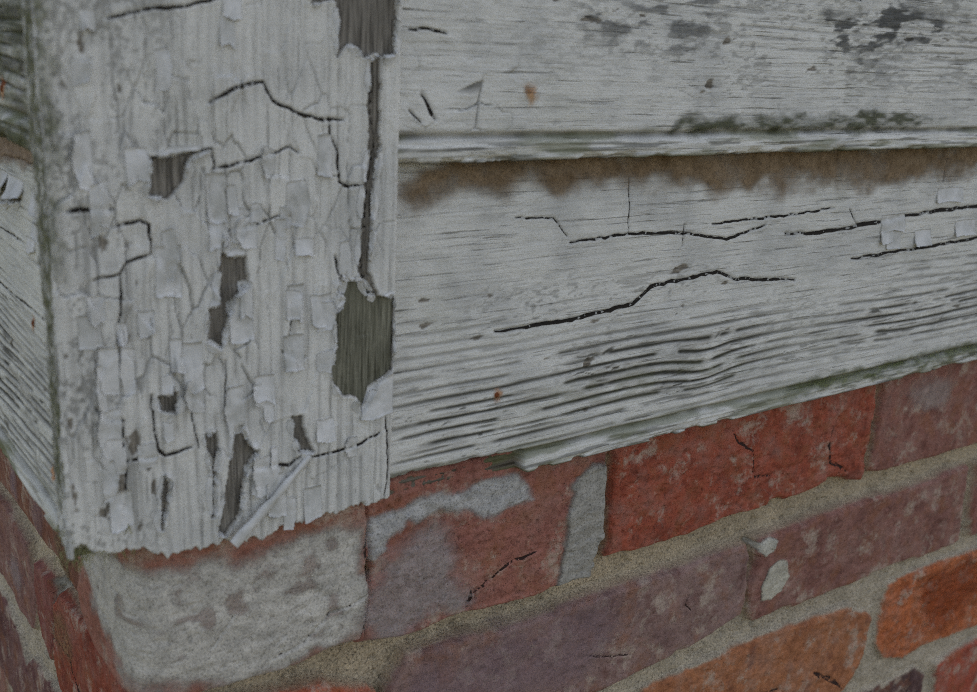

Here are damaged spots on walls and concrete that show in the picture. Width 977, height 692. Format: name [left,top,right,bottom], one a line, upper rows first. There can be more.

peeling [77,8,96,32]
peeling [0,169,39,254]
peeling [72,130,110,239]
peeling [285,0,402,421]
crack [516,181,881,243]
crack [905,205,977,217]
crack [851,236,977,259]
crack [494,270,794,332]
peeling [77,146,258,534]
peeling [201,374,322,541]
peeling [286,415,358,458]